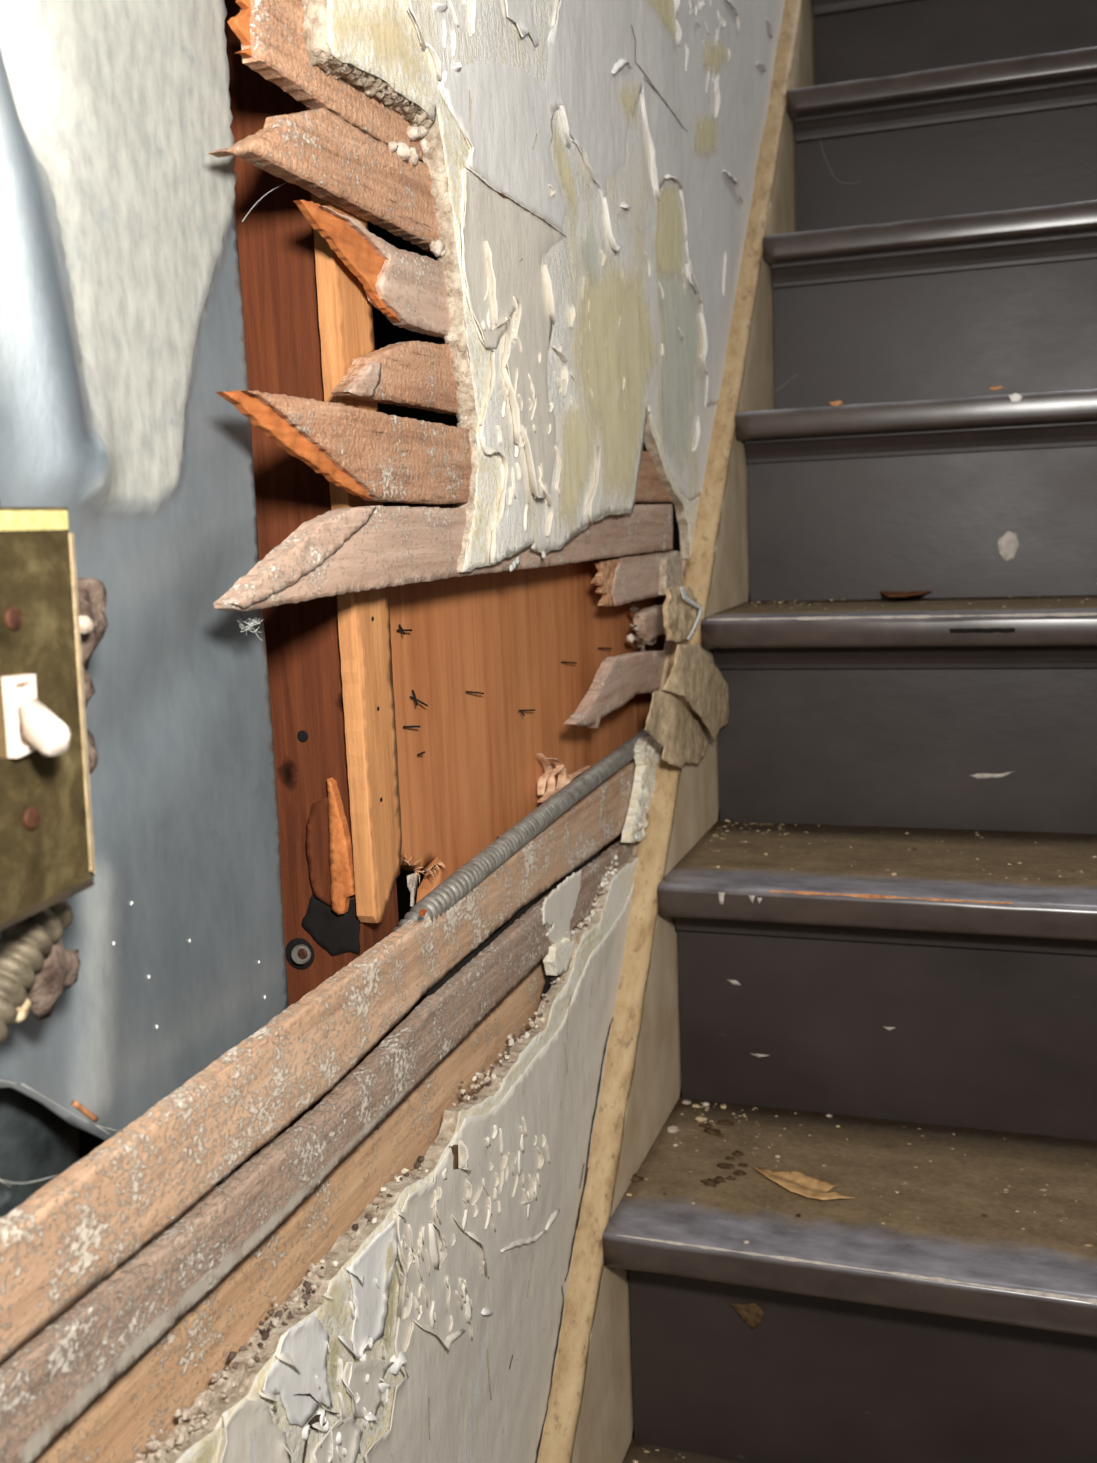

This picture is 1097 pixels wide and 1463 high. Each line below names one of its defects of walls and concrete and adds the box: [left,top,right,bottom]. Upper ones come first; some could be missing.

peeling [301,0,785,571]
spalling [627,602,656,652]
spalling [659,551,684,595]
peeling [135,736,664,1463]